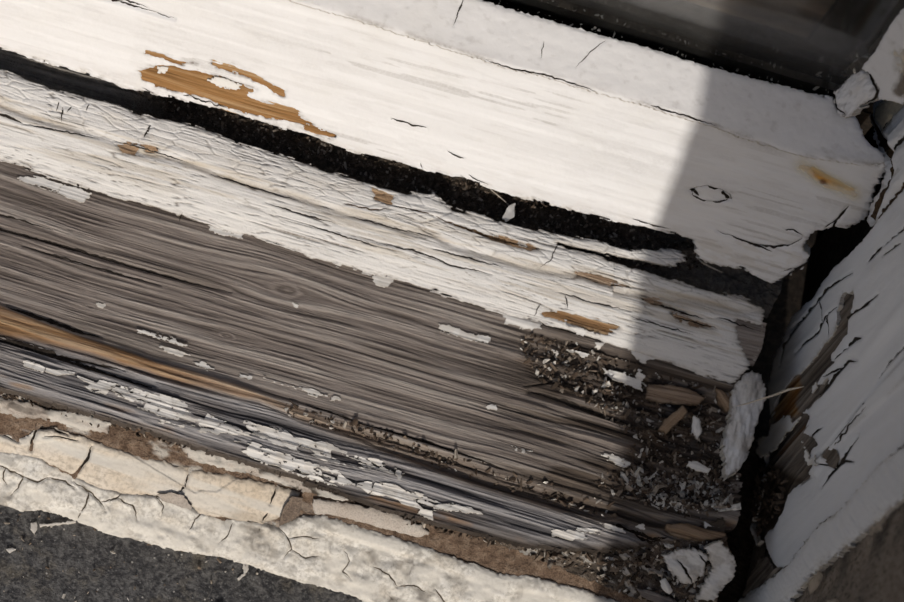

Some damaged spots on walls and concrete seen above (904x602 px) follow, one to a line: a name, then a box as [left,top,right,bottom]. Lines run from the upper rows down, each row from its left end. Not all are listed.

crack [111,0,170,18]
peeling [139,50,335,137]
corrosion [806,167,854,191]
peeling [137,329,215,371]
peeling [503,311,619,358]
peeling [602,350,655,392]
crack [0,425,189,519]
peeling [23,360,483,520]
peeling [755,294,854,548]
crack [812,402,865,486]
crack [222,489,318,559]
peeling [551,523,626,541]